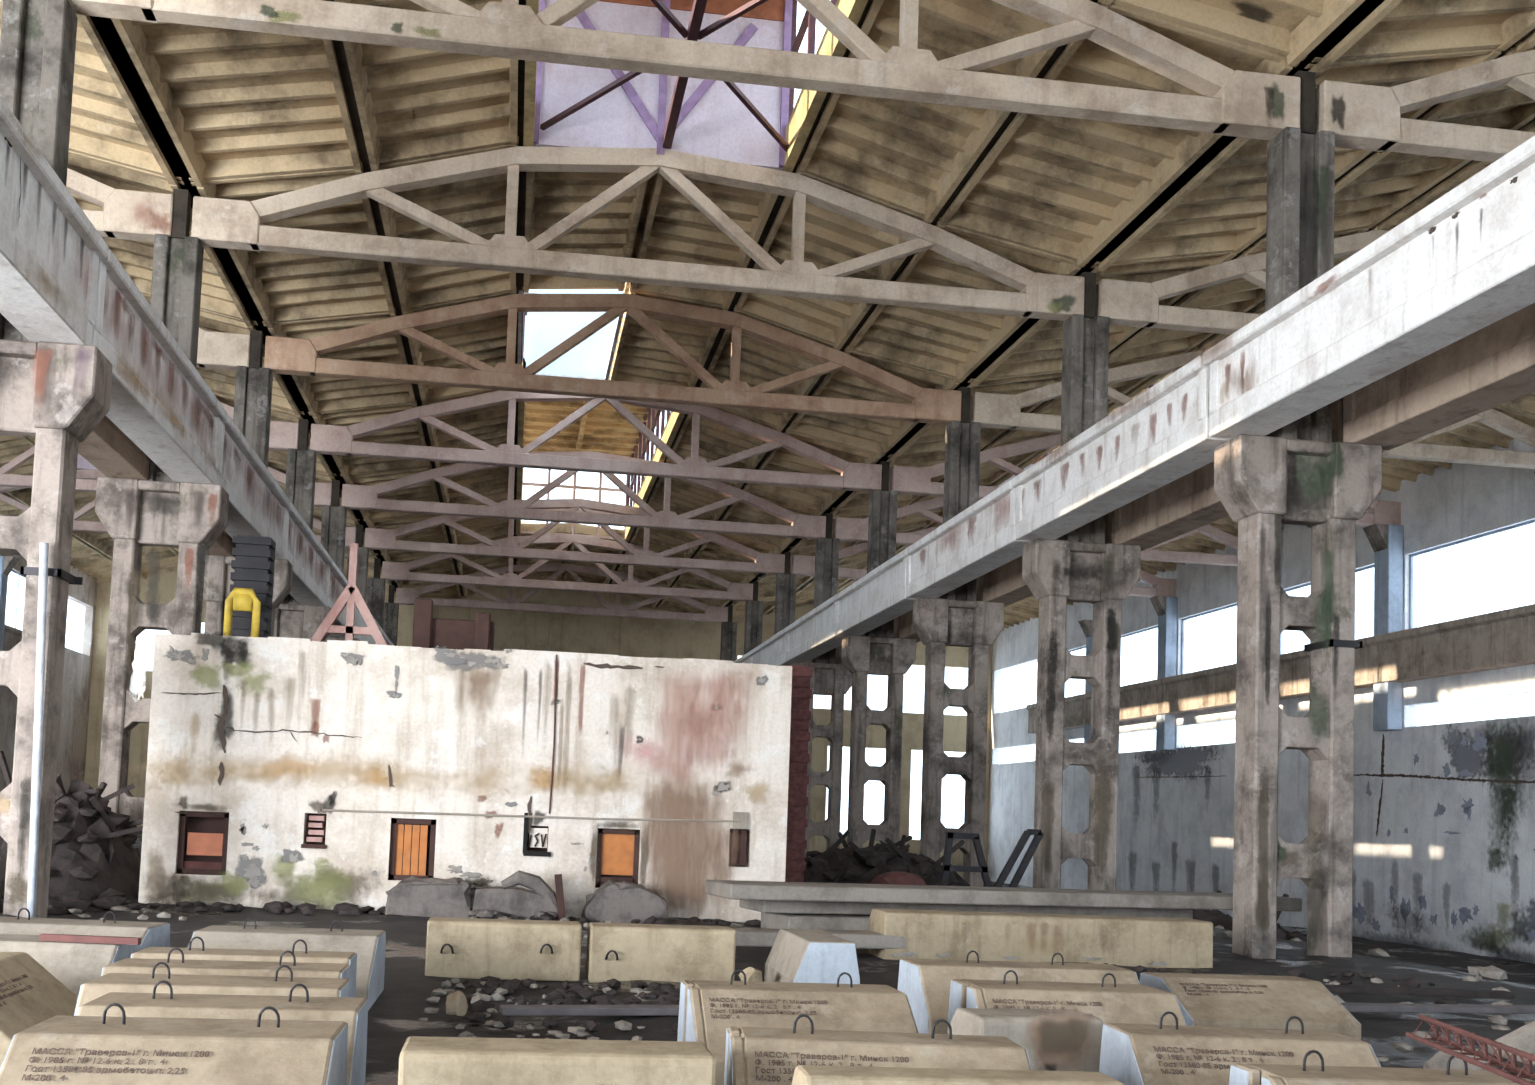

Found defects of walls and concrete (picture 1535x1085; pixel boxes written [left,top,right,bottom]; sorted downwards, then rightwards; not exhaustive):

rust [116,292,252,483]
flaking render [435,646,512,671]
water stain [1322,551,1339,681]
flaking render [236,823,269,889]
spalling [282,815,326,862]
water stain [1487,738,1523,845]